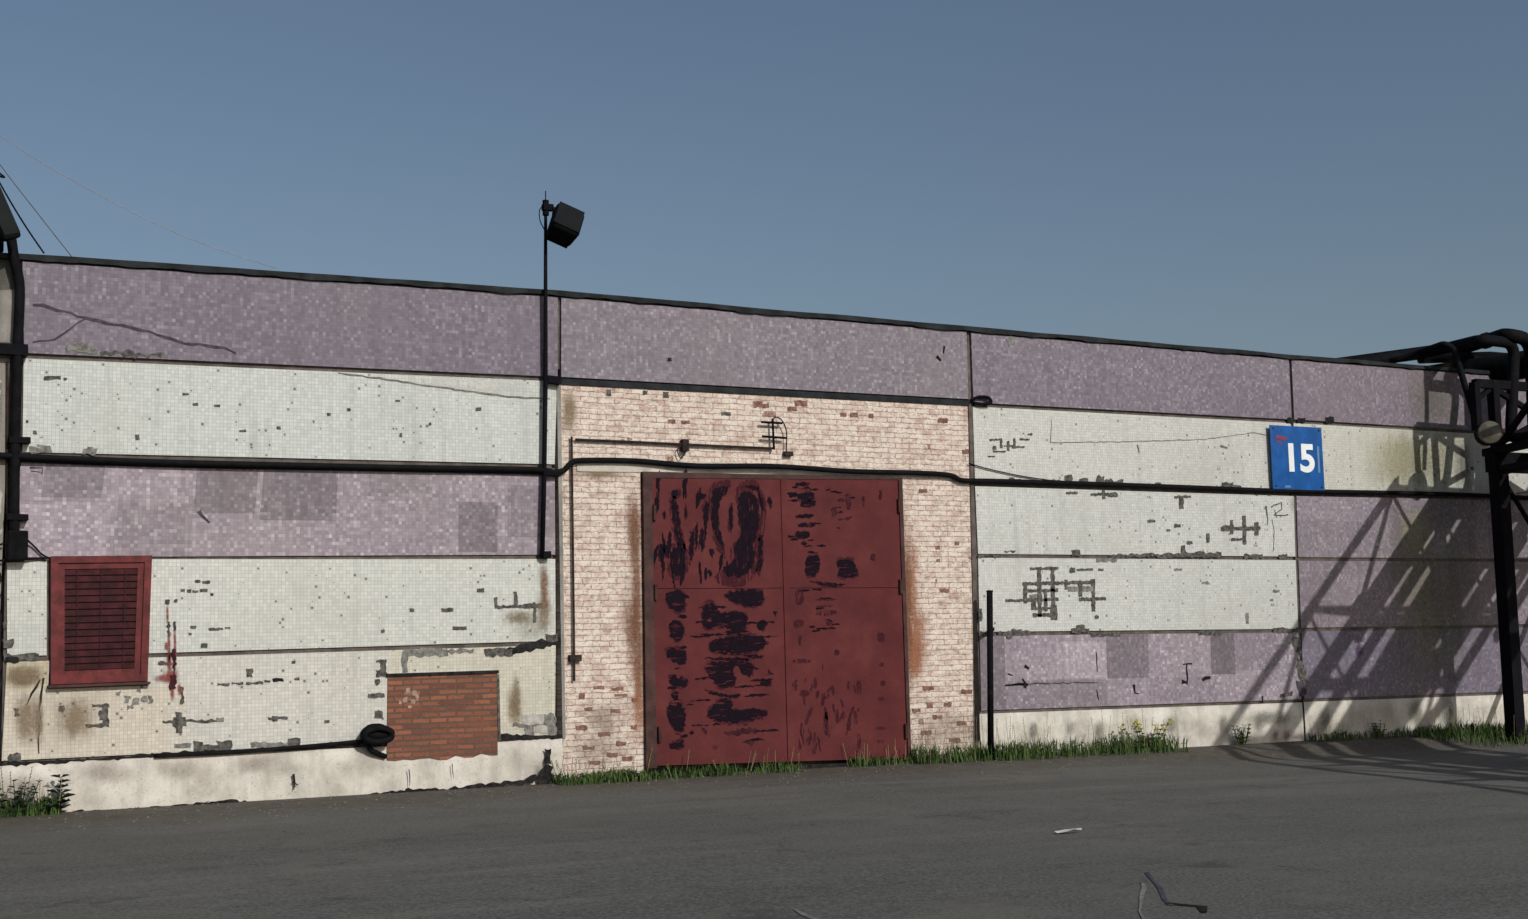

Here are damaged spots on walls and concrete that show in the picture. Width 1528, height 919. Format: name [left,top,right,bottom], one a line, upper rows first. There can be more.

crack [33,303,236,354]
peeling [787,400,807,411]
peeling [988,433,1033,457]
spalling [1052,474,1124,500]
spalling [1214,482,1274,496]
spalling [165,580,214,604]
rust [627,504,643,723]
spalling [977,495,1287,640]
spalling [368,588,561,719]
spalling [1273,627,1308,698]
spalling [0,621,312,767]
peeling [912,686,972,743]